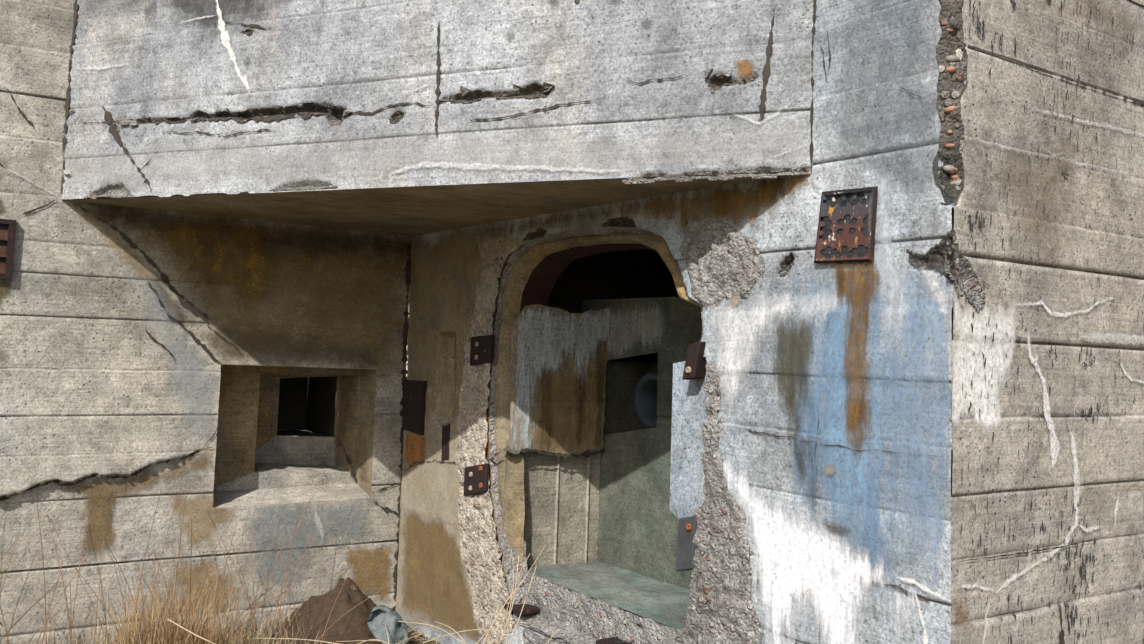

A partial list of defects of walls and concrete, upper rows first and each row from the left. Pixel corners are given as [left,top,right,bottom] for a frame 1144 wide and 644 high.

crack [224,21,272,29]
crack [156,102,430,137]
spalling [932,0,968,196]
crack [0,421,222,501]
crack [14,199,244,364]
spalling [455,228,566,644]
spalling [670,363,764,644]
leakage [713,180,968,564]
rust [836,262,879,447]
spalling [906,230,986,314]
crack [961,540,1094,562]
leakage [963,333,1101,644]